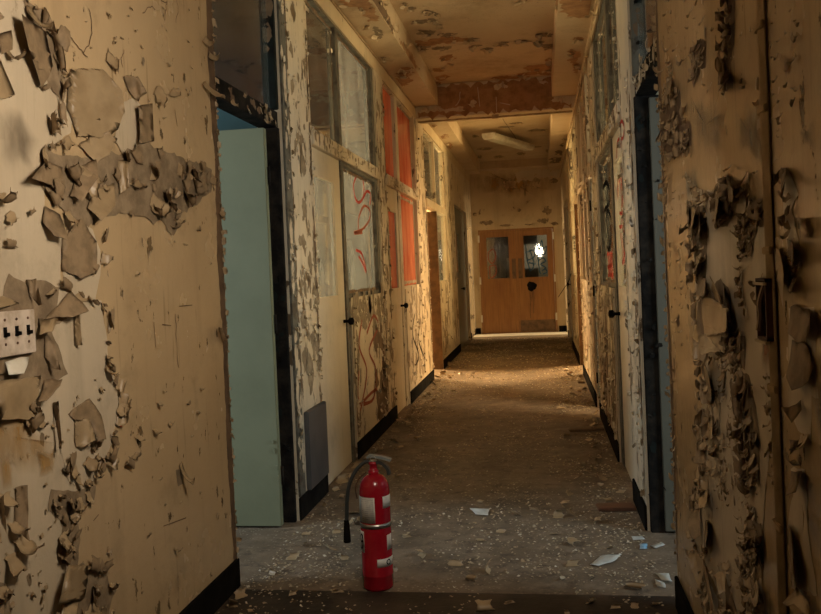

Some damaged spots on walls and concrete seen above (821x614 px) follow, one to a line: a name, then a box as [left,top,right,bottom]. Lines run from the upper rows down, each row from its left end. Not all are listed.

peeling [0,0,434,614]
peeling [338,0,818,614]